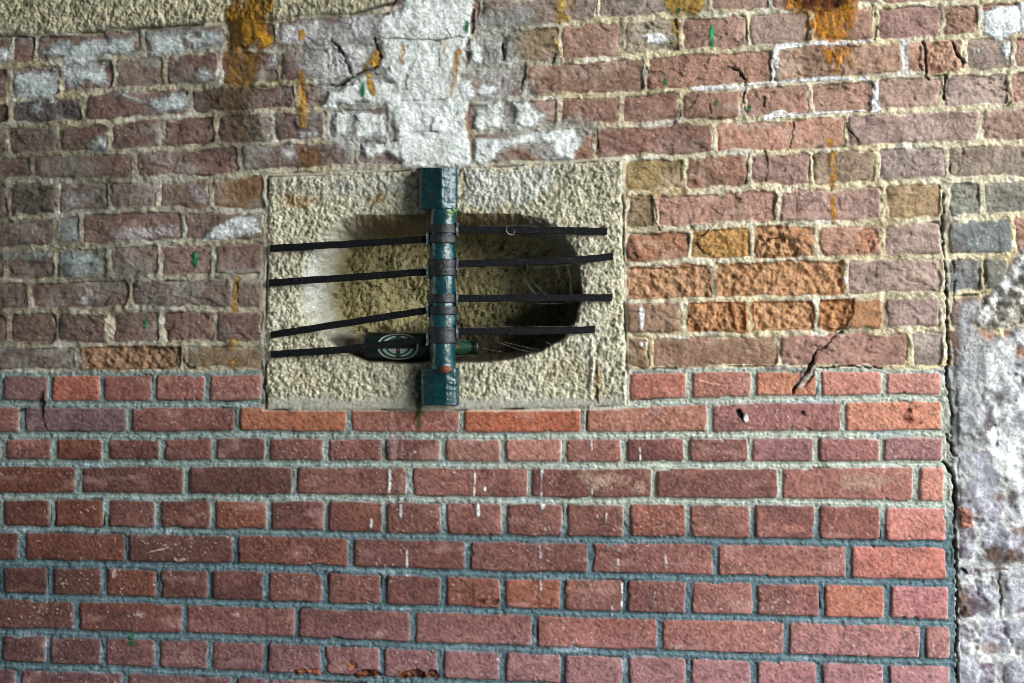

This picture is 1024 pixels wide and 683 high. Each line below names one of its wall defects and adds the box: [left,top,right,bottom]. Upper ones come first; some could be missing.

damp [221,0,392,167]
crack [335,9,474,87]
damp [451,7,593,214]
damp [557,0,574,23]
rust [784,0,858,73]
rust [828,138,837,221]
efflorescence [302,249,327,312]
crack [792,332,876,393]